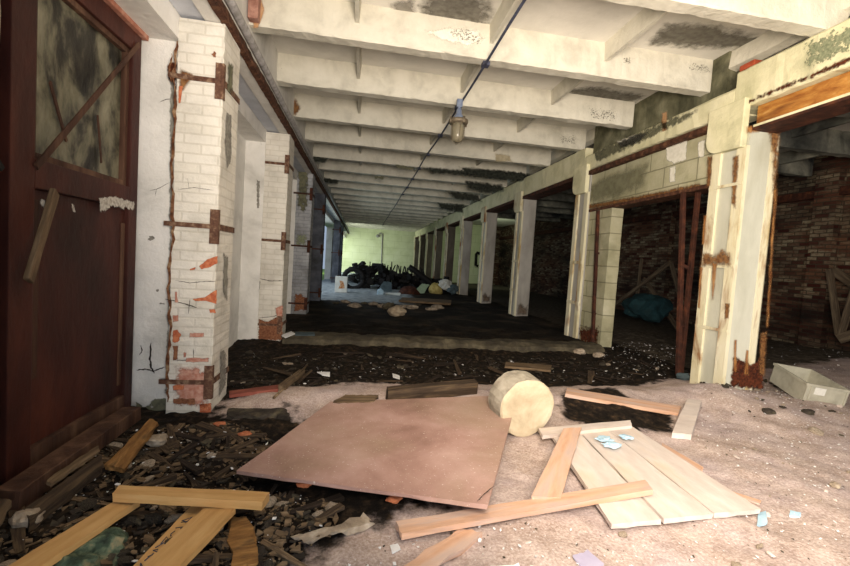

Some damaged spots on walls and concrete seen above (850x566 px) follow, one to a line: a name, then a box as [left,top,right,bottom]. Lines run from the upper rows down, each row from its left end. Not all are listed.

leakage [394,0,490,23]
leakage [652,24,756,48]
corrosion [167,62,193,103]
corrosion [749,57,850,103]
corrosion [769,132,779,277]
flaking render [190,254,228,313]
crack [137,344,210,373]
flaking render [172,315,209,362]
flaking render [258,306,283,341]
corrosion [730,287,770,389]
flaking render [136,385,212,413]